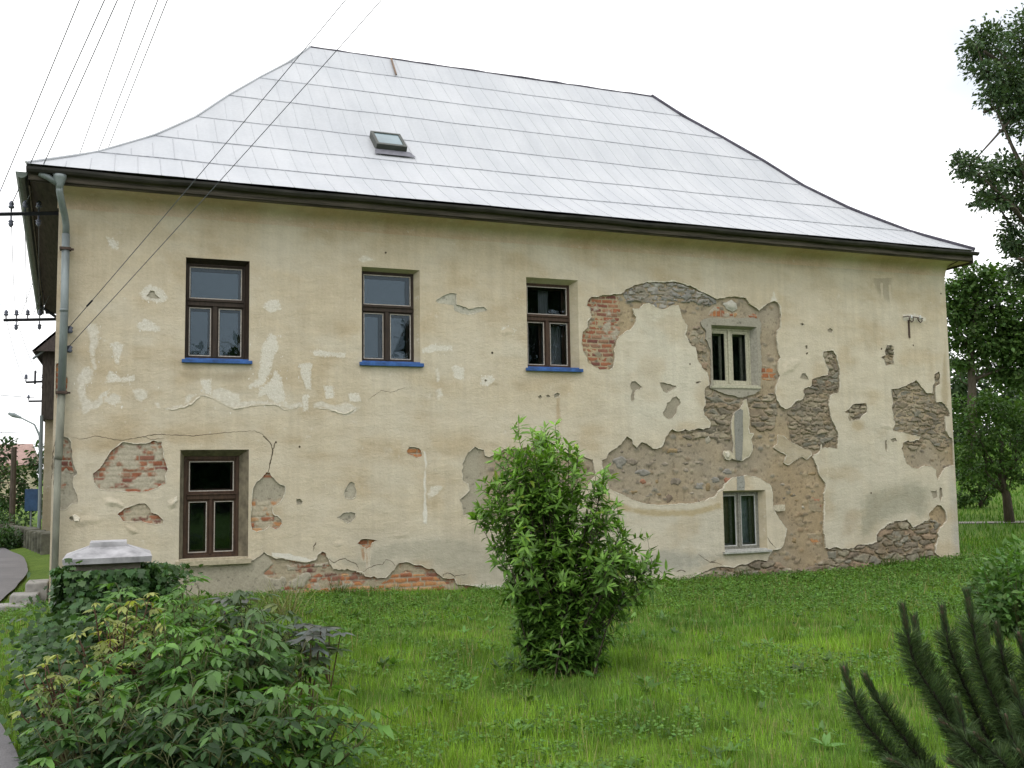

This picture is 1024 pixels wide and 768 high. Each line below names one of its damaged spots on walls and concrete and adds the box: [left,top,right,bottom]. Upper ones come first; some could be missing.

flaking render [436,293,487,315]
crack [51,430,276,479]
flaking render [407,446,422,458]
flaking render [460,280,955,579]
flaking render [93,440,168,525]
flaking render [251,472,303,533]
flaking render [178,551,502,598]